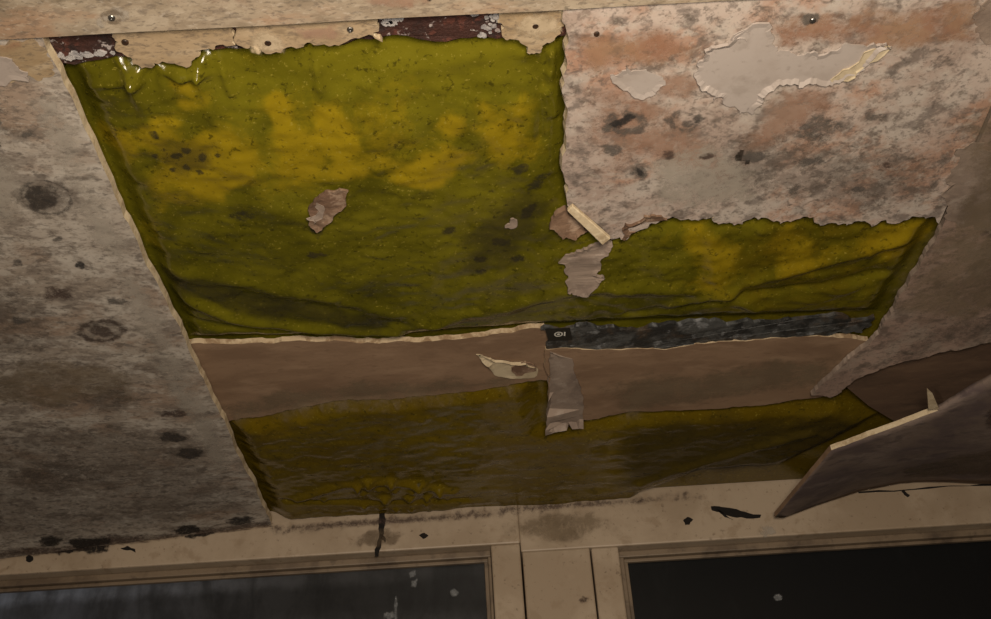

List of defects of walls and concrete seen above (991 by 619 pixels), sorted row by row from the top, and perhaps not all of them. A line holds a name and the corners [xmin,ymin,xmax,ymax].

peeling [379,18,404,27]
peeling [471,13,501,38]
leakage [516,15,561,39]
leakage [251,31,283,54]
peeling [694,22,892,115]
peeling [610,65,666,100]
leakage [0,158,72,217]
leakage [78,319,125,342]